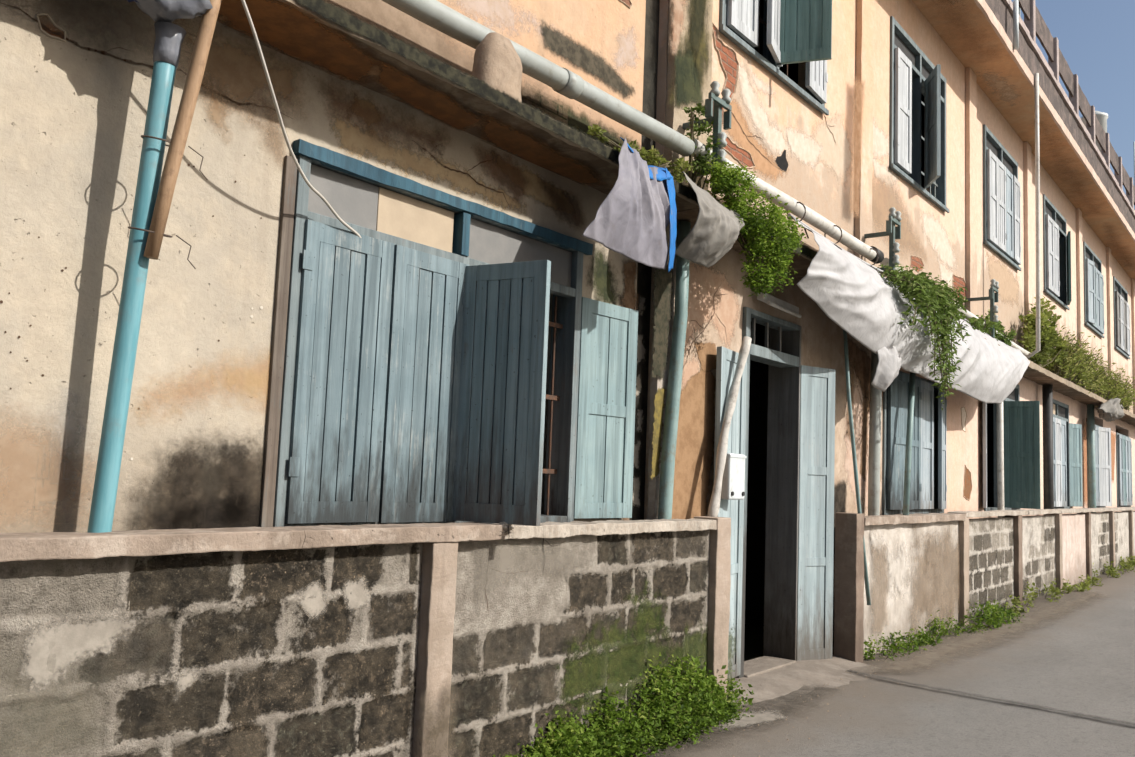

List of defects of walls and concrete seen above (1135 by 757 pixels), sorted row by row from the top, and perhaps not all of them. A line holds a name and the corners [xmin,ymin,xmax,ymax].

crack [0,2,295,120]
leakage [298,0,640,164]
leakage [670,0,710,107]
peeling [711,22,853,186]
leakage [666,179,698,203]
leakage [128,442,264,531]
leakage [79,531,709,757]